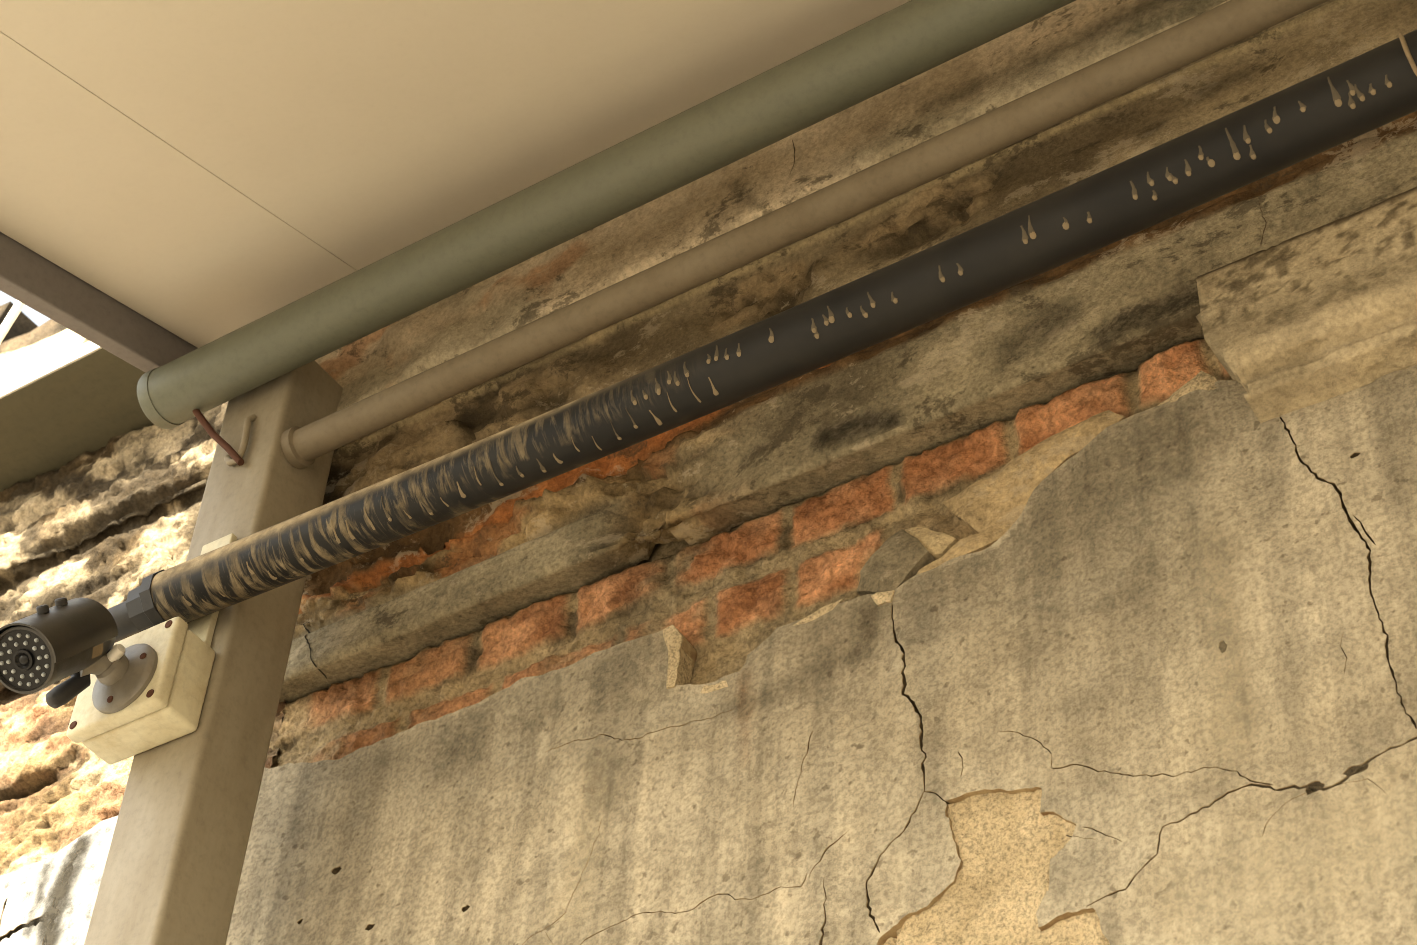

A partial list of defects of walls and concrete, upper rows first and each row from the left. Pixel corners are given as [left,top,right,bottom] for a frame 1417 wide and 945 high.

spalling [0,402,228,628]
spalling [265,339,1234,769]
leakage [817,415,898,445]
crack [1010,417,1417,897]
crack [0,900,55,942]
spalling [0,676,134,876]
crack [819,850,827,945]
crack [866,605,963,933]
spalling [884,789,1110,945]